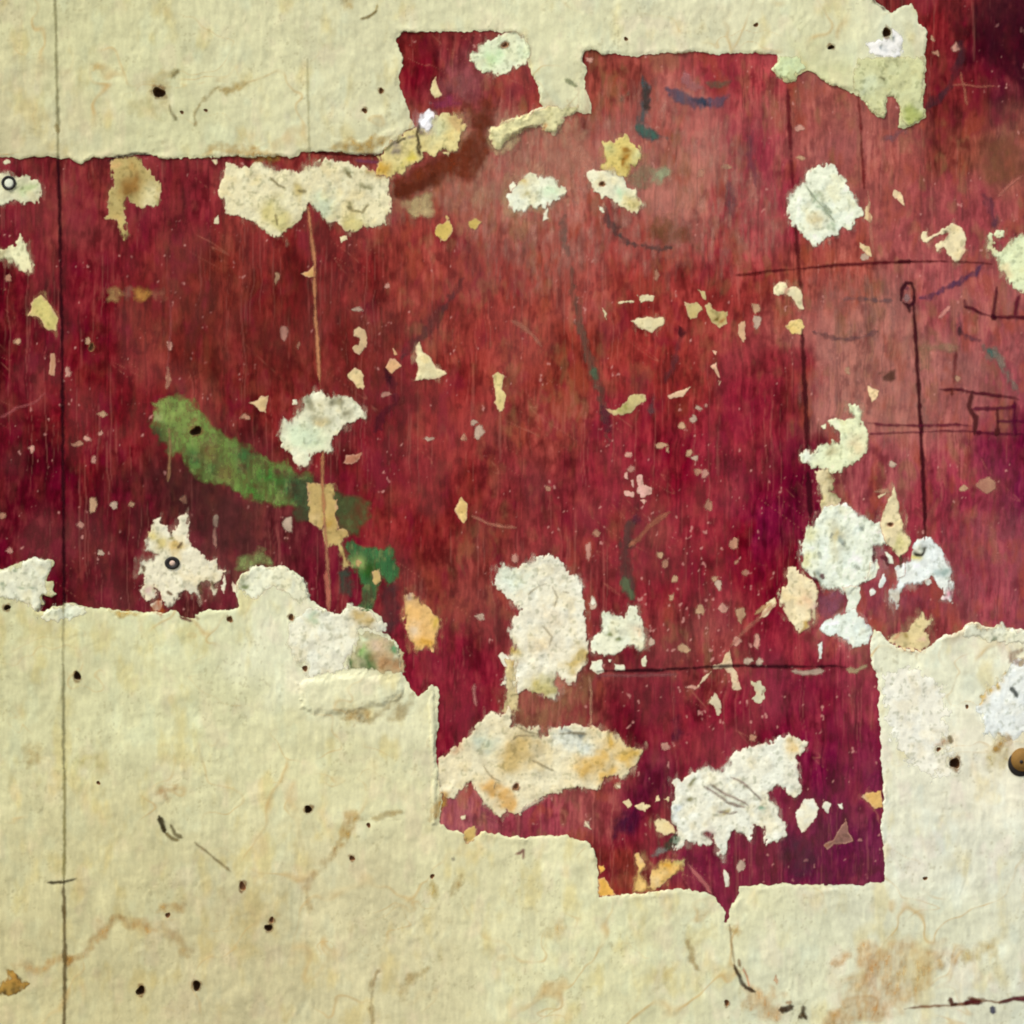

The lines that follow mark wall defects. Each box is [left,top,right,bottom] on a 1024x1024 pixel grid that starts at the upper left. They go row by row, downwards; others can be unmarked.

peeling [376,30,543,178]
flaking render [218,148,450,238]
flaking render [786,163,864,247]
flaking render [280,390,366,467]
flaking render [799,403,868,474]
flaking render [138,513,226,607]
flaking render [799,502,886,613]
flaking render [889,536,954,610]
flaking render [495,553,589,700]
flaking render [591,605,645,657]
flaking render [437,706,643,817]
flaking render [671,732,808,856]